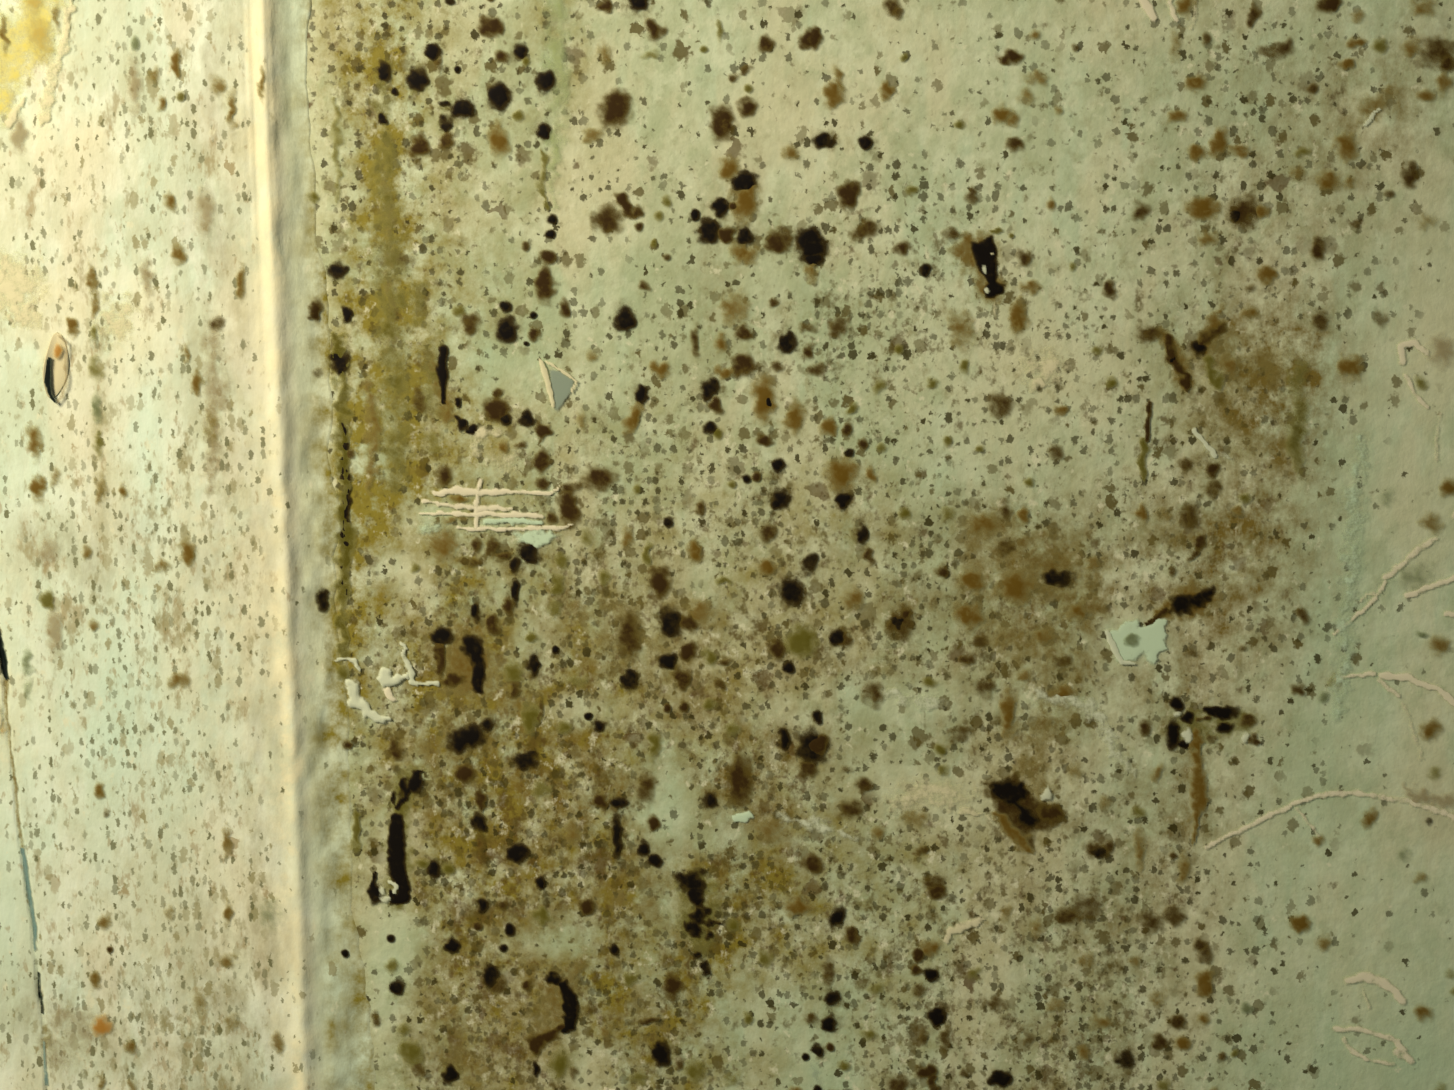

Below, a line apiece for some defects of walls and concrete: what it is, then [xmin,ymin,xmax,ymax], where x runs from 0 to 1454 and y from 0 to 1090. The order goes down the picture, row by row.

damp [438,81,560,239]
damp [690,170,758,248]
mould [950,227,1014,304]
damp [315,43,442,680]
peeling [539,359,578,410]
peeling [513,529,555,548]
peeling [335,642,439,724]
peeling [1105,619,1167,665]
crack [0,633,48,1085]
damp [366,768,454,909]
mould [982,756,1065,854]
mould [1166,696,1261,844]